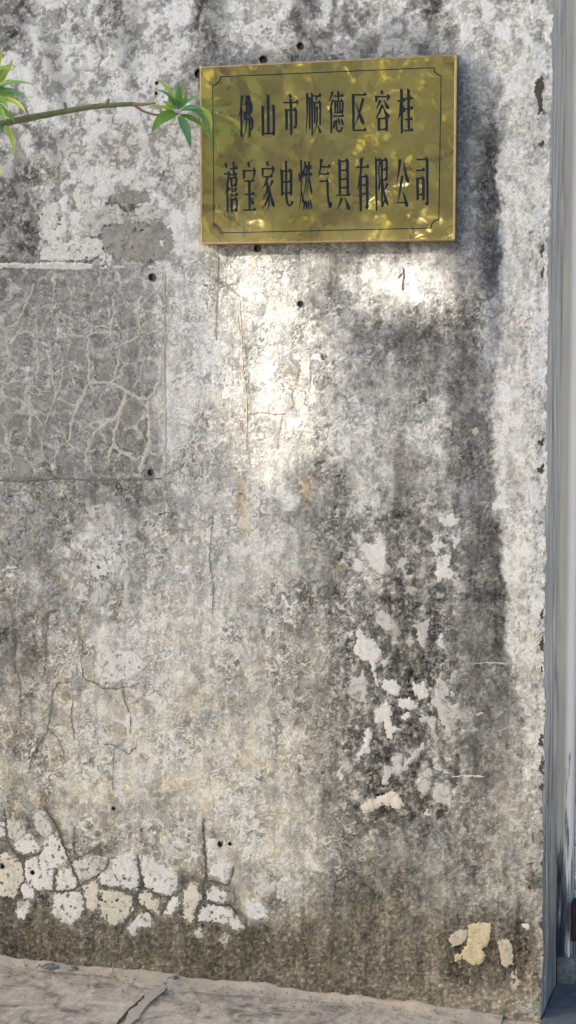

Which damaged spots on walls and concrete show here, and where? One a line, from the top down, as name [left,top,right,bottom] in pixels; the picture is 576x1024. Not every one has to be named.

peeling [354,509,464,596]
peeling [375,610,445,649]
crack [0,807,238,947]